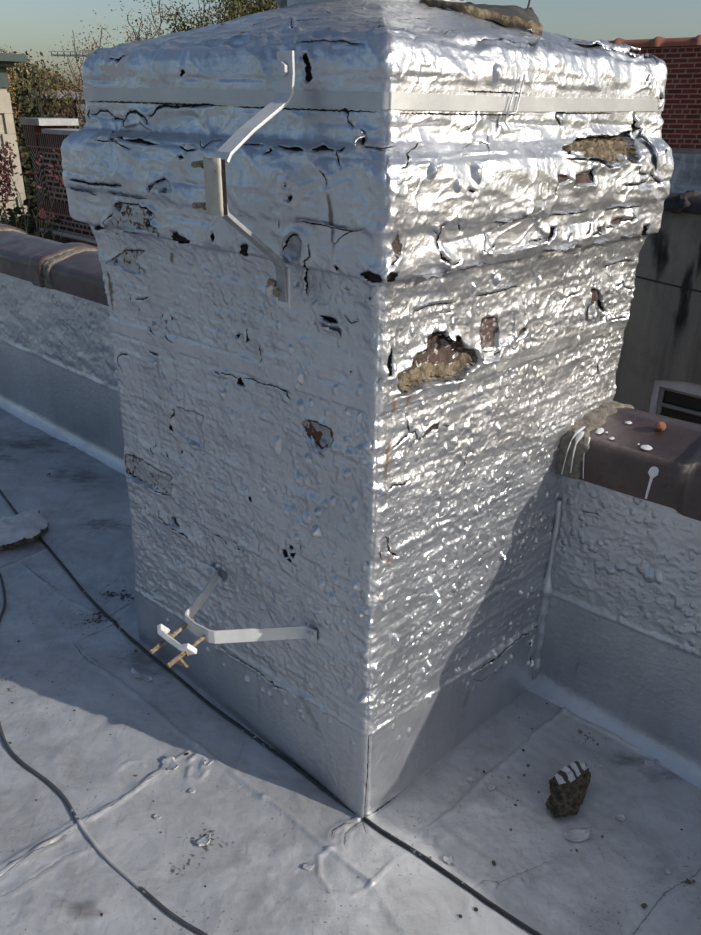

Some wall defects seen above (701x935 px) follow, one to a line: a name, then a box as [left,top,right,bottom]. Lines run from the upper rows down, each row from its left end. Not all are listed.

crack [70,179,121,187]
crack [87,103,213,149]
crack [319,108,418,186]
spalling [558,131,639,187]
crack [625,167,661,186]
crack [425,222,460,267]
water stain [653,233,668,271]
water stain [676,244,701,330]
spalling [397,311,528,396]
peeling [300,420,333,459]
crack [394,396,421,448]
peeling [125,454,172,494]